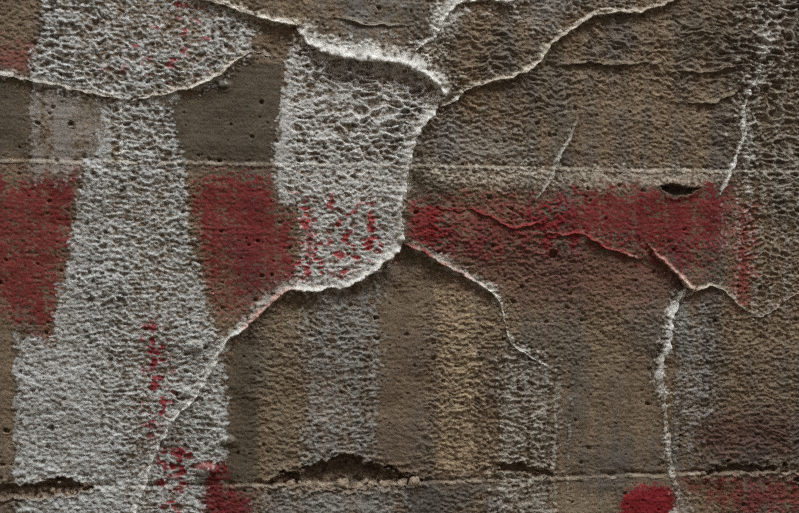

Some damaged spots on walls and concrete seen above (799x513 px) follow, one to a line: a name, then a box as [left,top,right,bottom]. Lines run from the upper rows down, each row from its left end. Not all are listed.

crack [0,46,278,160]
crack [116,0,676,513]
crack [439,207,799,513]
crack [556,33,768,196]